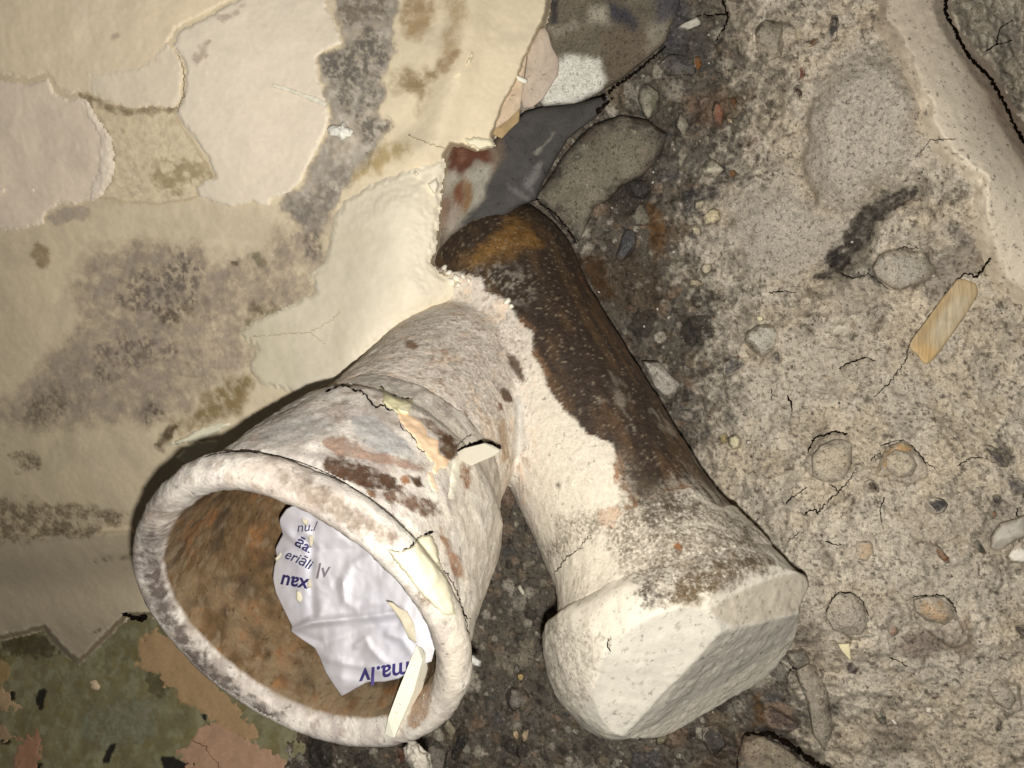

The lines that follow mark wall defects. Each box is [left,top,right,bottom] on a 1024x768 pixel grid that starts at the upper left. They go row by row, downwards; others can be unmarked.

peeling [0,0,342,231]
crack [943,0,1024,144]
leakage [0,0,433,428]
crack [839,257,991,397]
leakage [156,425,177,447]
crack [325,384,425,452]
crack [457,434,501,452]
crack [786,440,994,543]
peeling [0,658,44,768]
hole [36,689,46,710]
spalling [103,744,115,763]
peeling [133,627,287,768]